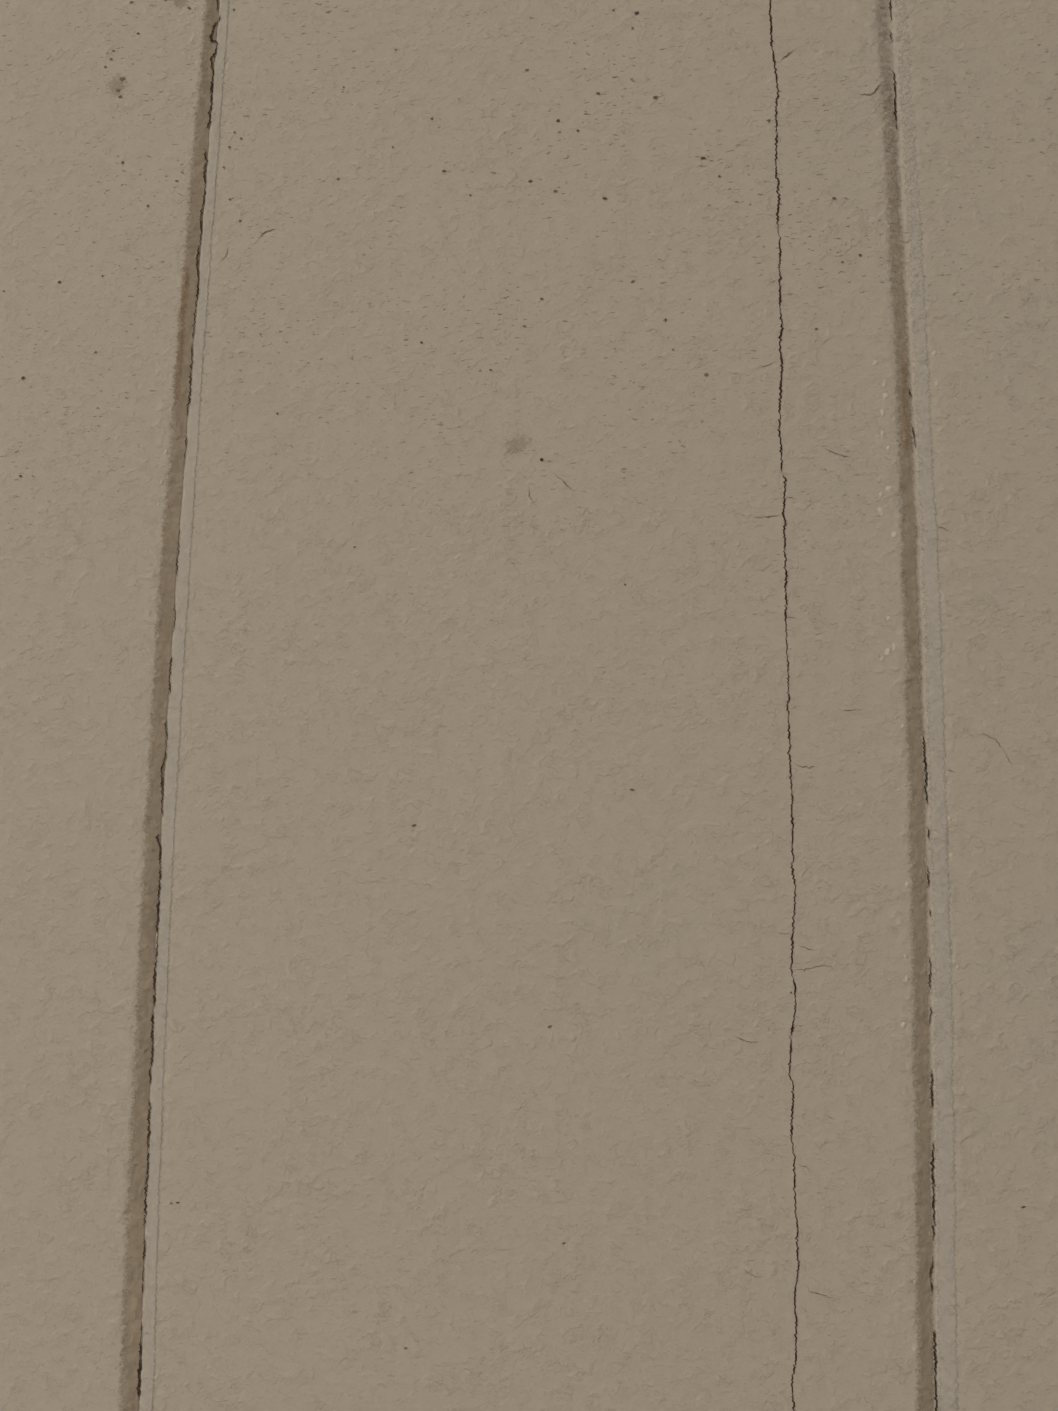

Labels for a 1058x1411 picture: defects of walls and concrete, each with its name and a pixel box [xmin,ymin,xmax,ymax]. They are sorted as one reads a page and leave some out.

crack [756,0,831,1411]